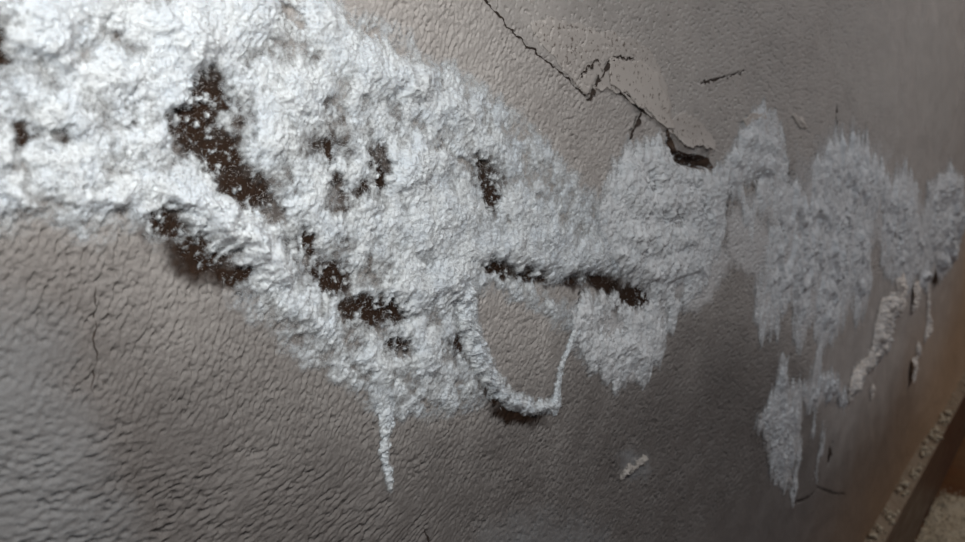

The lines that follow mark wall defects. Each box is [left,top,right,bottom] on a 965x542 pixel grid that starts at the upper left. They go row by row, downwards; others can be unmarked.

crack [484,0,647,140]
peeling [531,16,716,170]
leakage [912,341,922,384]